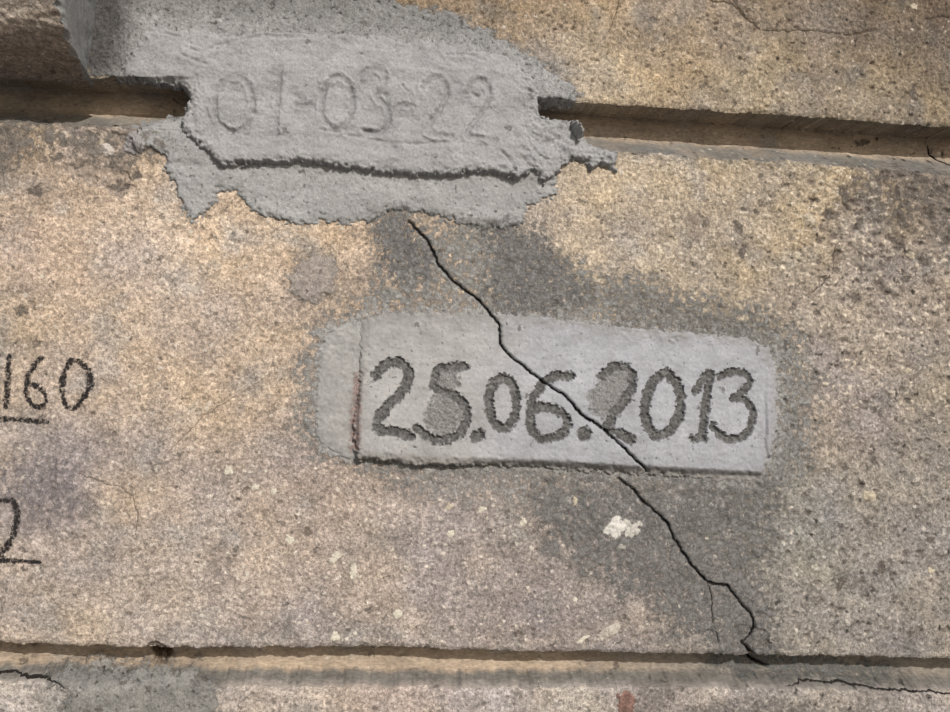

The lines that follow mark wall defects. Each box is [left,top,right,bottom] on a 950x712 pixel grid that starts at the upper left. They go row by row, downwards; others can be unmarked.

crack [409,222,766,665]
crack [0,669,64,688]
crack [785,678,950,695]